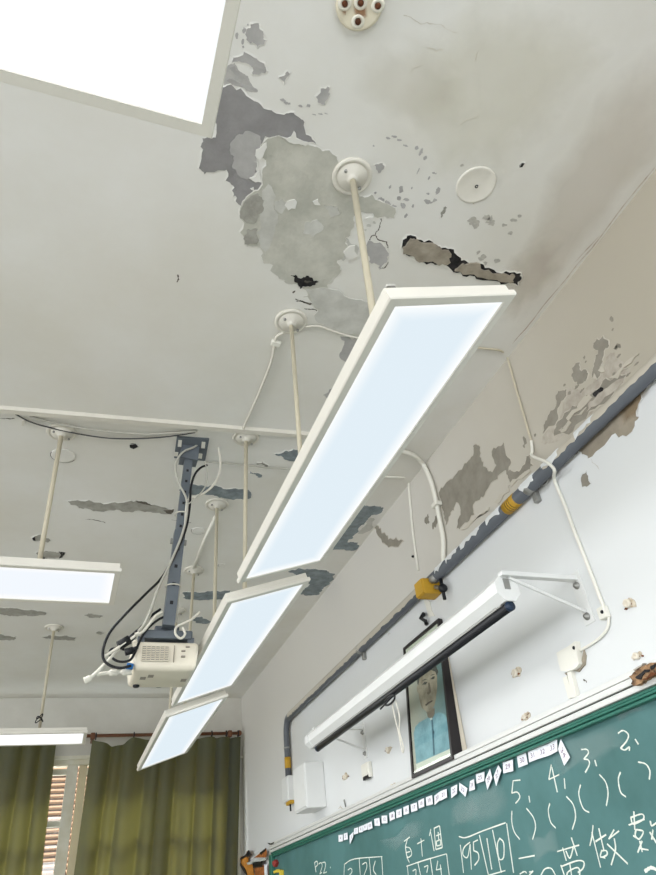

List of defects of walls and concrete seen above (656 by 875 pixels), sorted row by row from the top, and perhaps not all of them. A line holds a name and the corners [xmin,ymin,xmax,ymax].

peeling [197,21,414,362]
peeling [467,214,522,235]
spalling [400,234,523,286]
peeling [424,316,649,574]
spalling [249,448,298,478]
spalling [65,499,175,515]
spalling [192,483,253,501]
spalling [332,504,404,551]
spalling [288,568,337,596]
spalling [0,607,48,617]